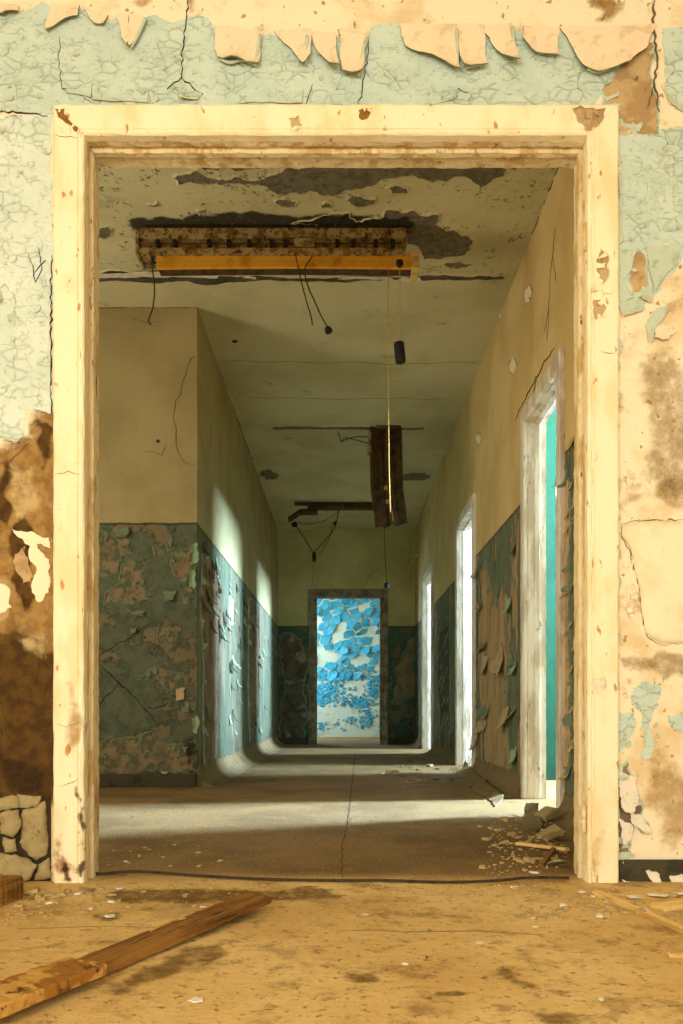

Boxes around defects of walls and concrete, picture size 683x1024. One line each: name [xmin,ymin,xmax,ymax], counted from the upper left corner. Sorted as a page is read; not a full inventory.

crack [0,110,76,138]
crack [167,0,203,95]
crack [358,43,369,101]
crack [28,252,53,412]
peeling [0,1,683,443]
crack [515,168,559,420]
water stain [0,411,54,805]
peeling [12,529,51,602]
peeling [99,526,307,774]
peeling [306,597,454,735]
peeling [469,558,517,774]
flaking render [0,794,52,882]